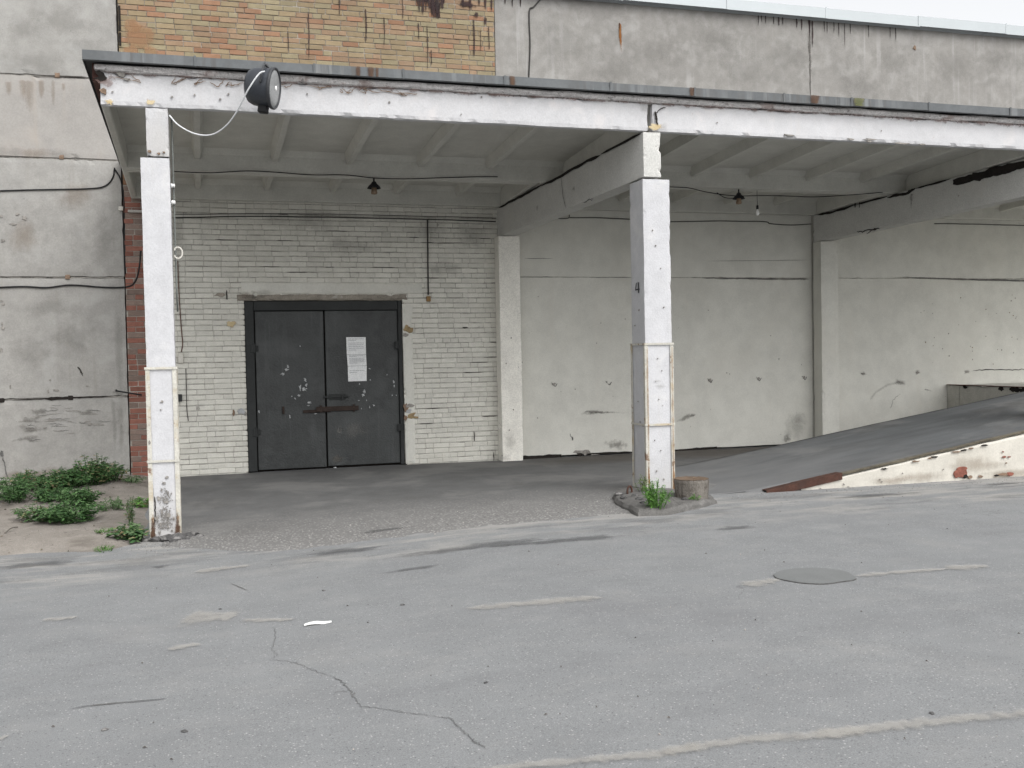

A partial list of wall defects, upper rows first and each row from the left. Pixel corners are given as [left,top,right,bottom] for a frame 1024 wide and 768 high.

damp [796,19,851,46]
spalling [93,70,130,95]
crack [499,107,666,208]
crack [818,179,949,215]
spalling [943,451,1014,479]
peeling [154,476,176,534]
crack [268,627,488,749]